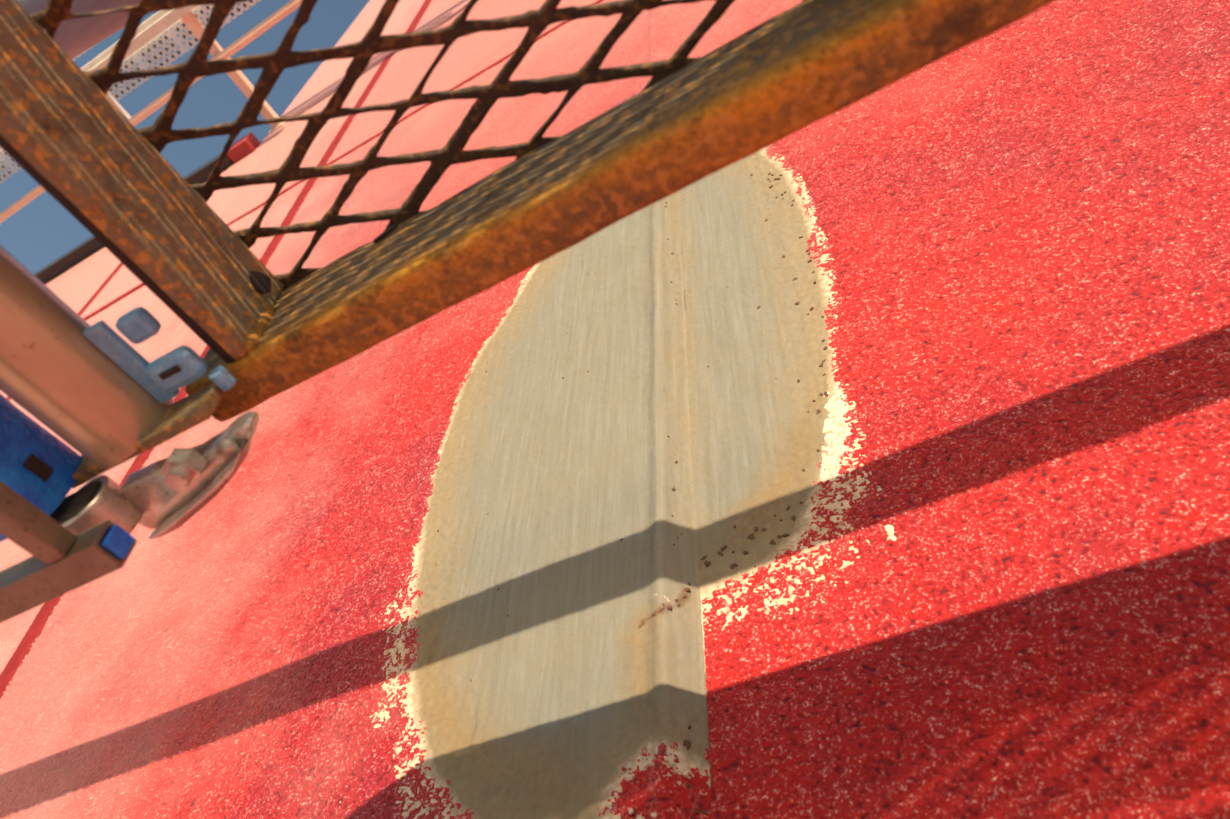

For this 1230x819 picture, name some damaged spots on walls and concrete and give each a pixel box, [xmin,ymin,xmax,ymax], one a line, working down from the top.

peeling [370,146,882,819]
peeling [884,525,897,541]